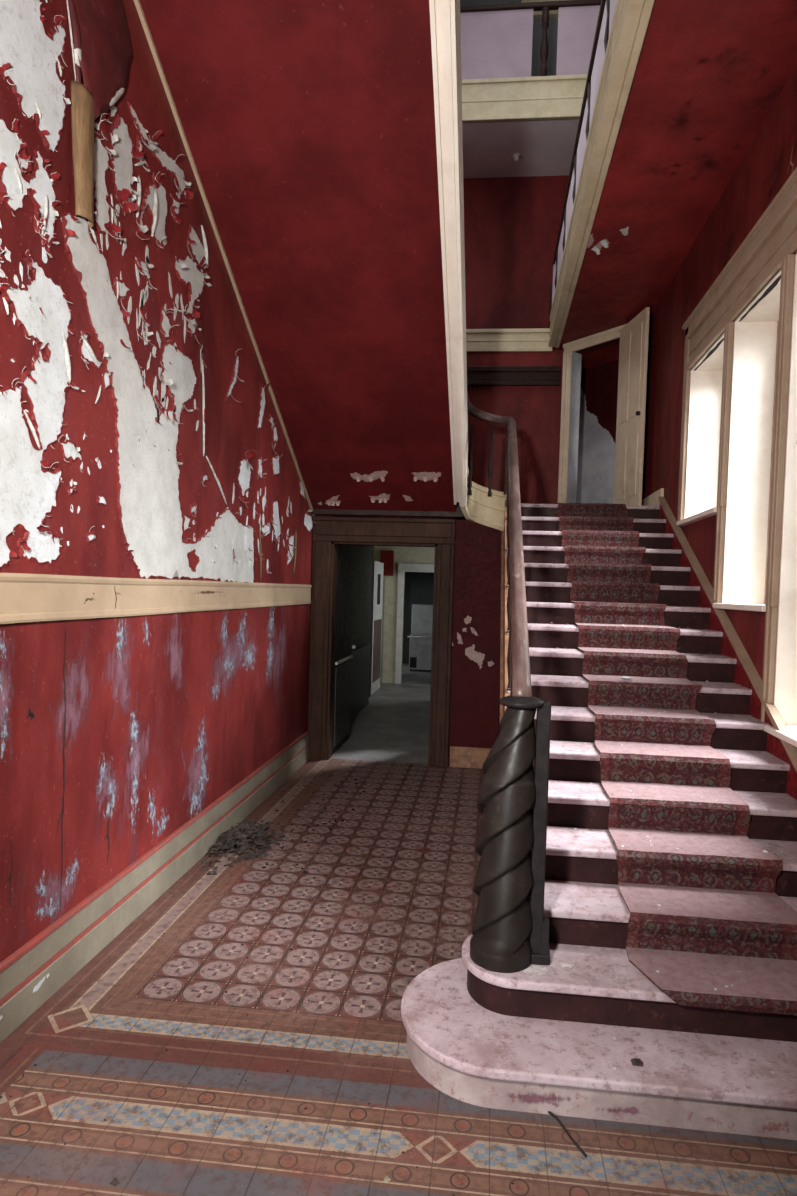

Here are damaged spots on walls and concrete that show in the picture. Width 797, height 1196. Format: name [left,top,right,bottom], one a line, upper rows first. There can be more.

peeling [0,0,341,583]
peeling [350,471,413,503]
peeling [412,472,441,482]
water stain [0,632,11,759]
water stain [56,656,88,743]
water stain [96,618,169,837]
water stain [167,614,182,687]
water stain [184,719,211,815]
water stain [212,606,287,705]
peeling [452,615,494,669]
water stain [35,858,79,921]